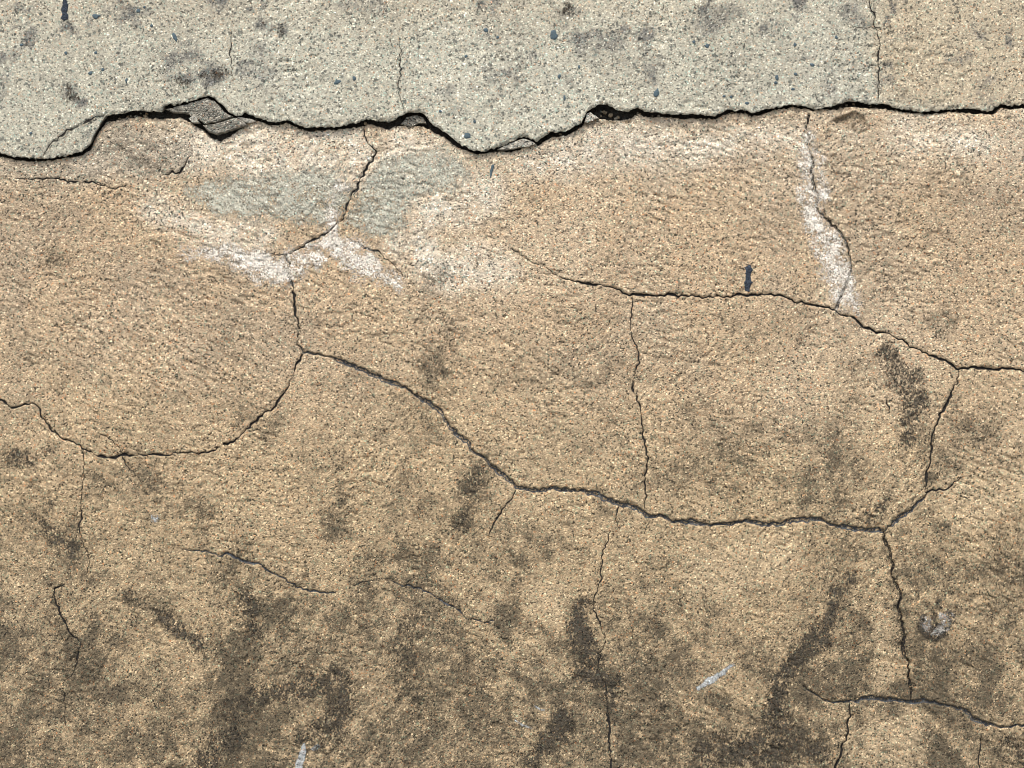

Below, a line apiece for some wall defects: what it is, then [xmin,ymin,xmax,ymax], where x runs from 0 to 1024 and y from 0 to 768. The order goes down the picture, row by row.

peeling [151,98,266,135]
leakage [180,179,403,292]
crack [0,94,1024,276]
leakage [796,128,861,314]
crack [0,268,1024,768]